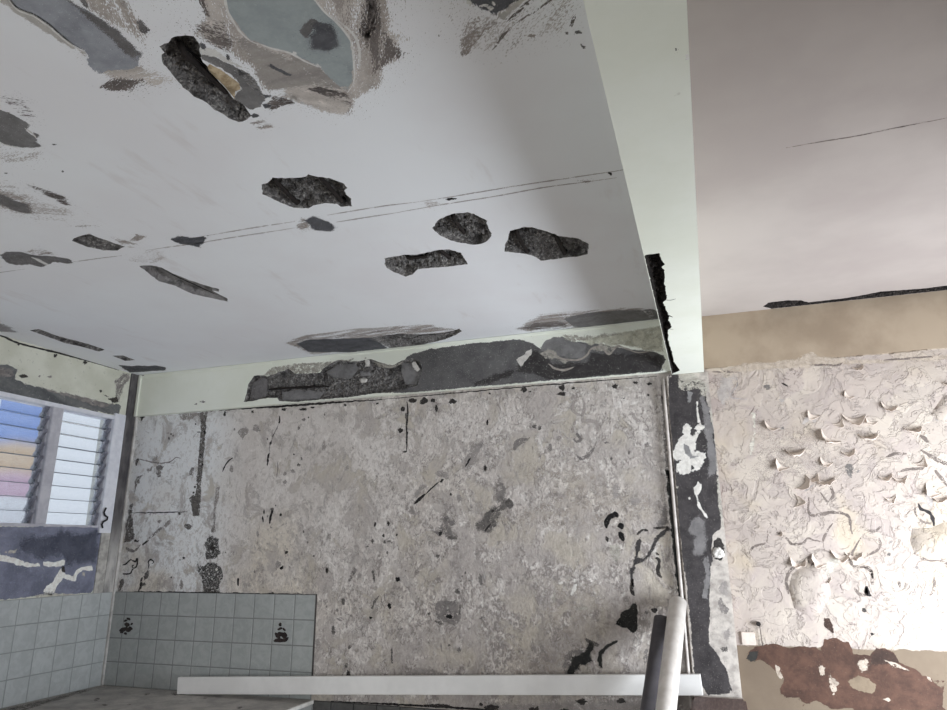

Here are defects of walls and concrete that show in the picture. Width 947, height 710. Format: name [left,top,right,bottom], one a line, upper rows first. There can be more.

peeling [466,0,519,19]
peeling [0,0,153,100]
peeling [159,0,363,122]
spalling [262,174,352,208]
peeling [0,249,78,267]
spalling [72,225,228,301]
spalling [385,212,491,277]
spalling [505,227,589,261]
spalling [30,329,104,351]
spalling [244,357,422,402]
peeling [498,447,659,546]
peeling [645,253,947,710]